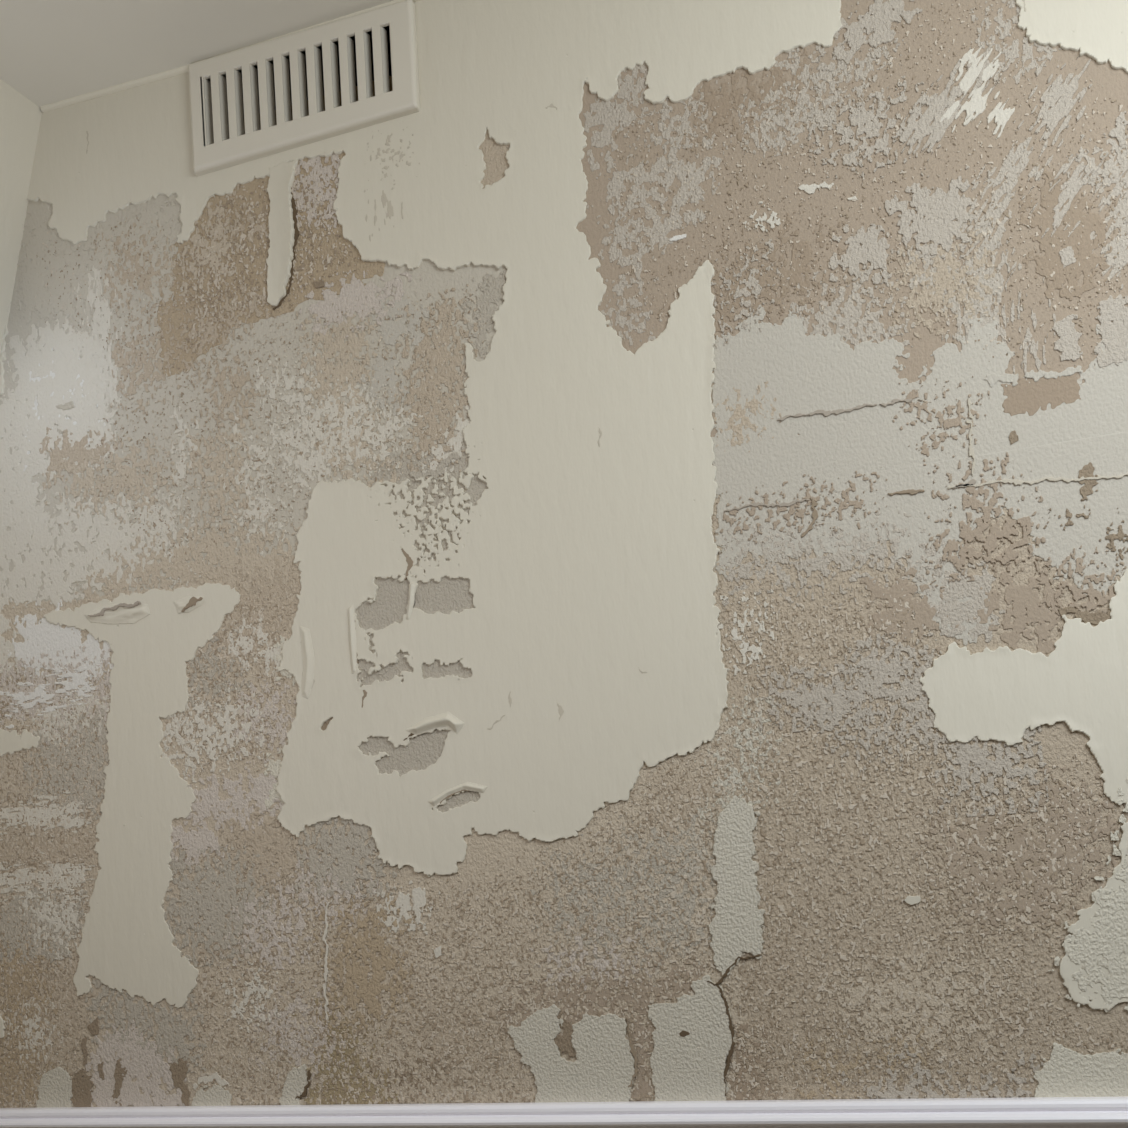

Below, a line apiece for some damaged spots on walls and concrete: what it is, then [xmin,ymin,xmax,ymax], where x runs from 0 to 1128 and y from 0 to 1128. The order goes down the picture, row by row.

peeling [479,130,510,189]
peeling [576,0,1128,466]
peeling [0,226,102,405]
spalling [723,471,884,534]
peeling [0,572,90,645]
peeling [355,576,475,654]
peeling [357,651,413,687]
peeling [422,659,472,679]
peeling [359,729,449,777]
peeling [0,716,108,1068]
crack [707,954,761,1096]
spalling [112,1052,137,1107]